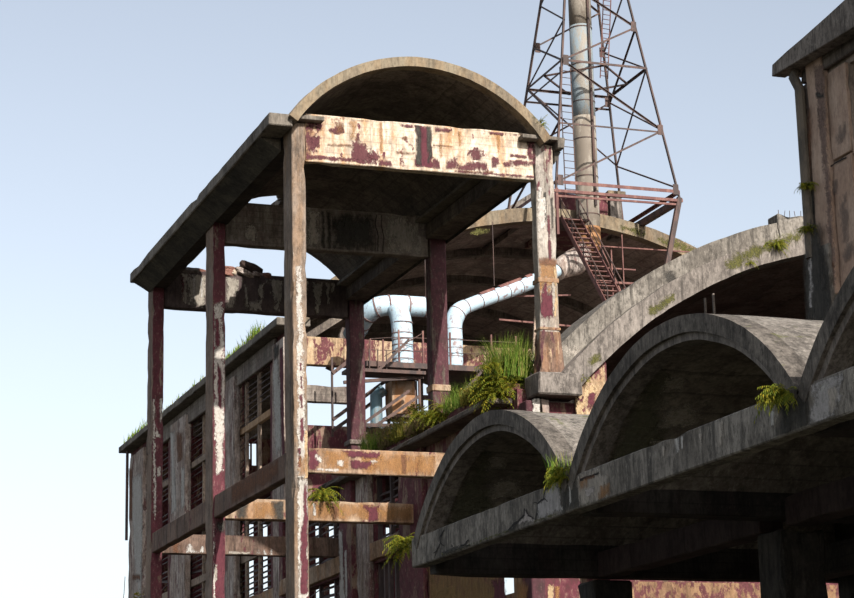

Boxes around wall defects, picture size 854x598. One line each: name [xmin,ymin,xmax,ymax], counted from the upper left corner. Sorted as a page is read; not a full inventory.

peeling [306,118,536,178]
peeling [537,197,558,318]
peeling [214,302,225,475]
peeling [273,344,285,455]
peeling [296,266,380,598]
crack [534,486,552,520]
peeling [213,520,225,598]